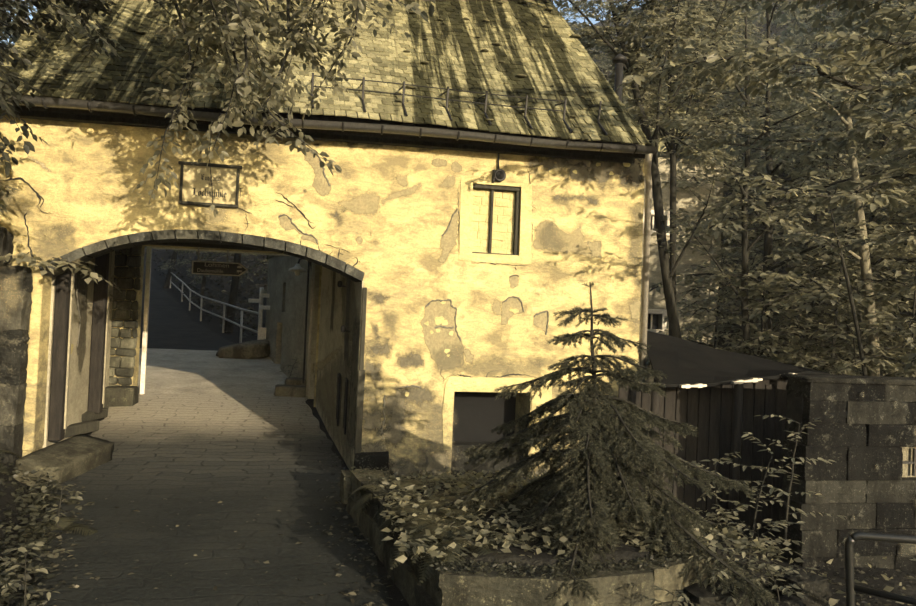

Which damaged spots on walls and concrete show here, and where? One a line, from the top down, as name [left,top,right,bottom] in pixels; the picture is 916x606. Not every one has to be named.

flaking render [301,142,331,196]
crack [0,177,54,267]
crack [276,192,360,267]
flaking render [331,175,422,222]
flaking render [439,209,458,263]
flaking render [533,220,602,258]
spalling [364,299,474,372]
spalling [492,275,524,325]
spalling [534,310,549,335]